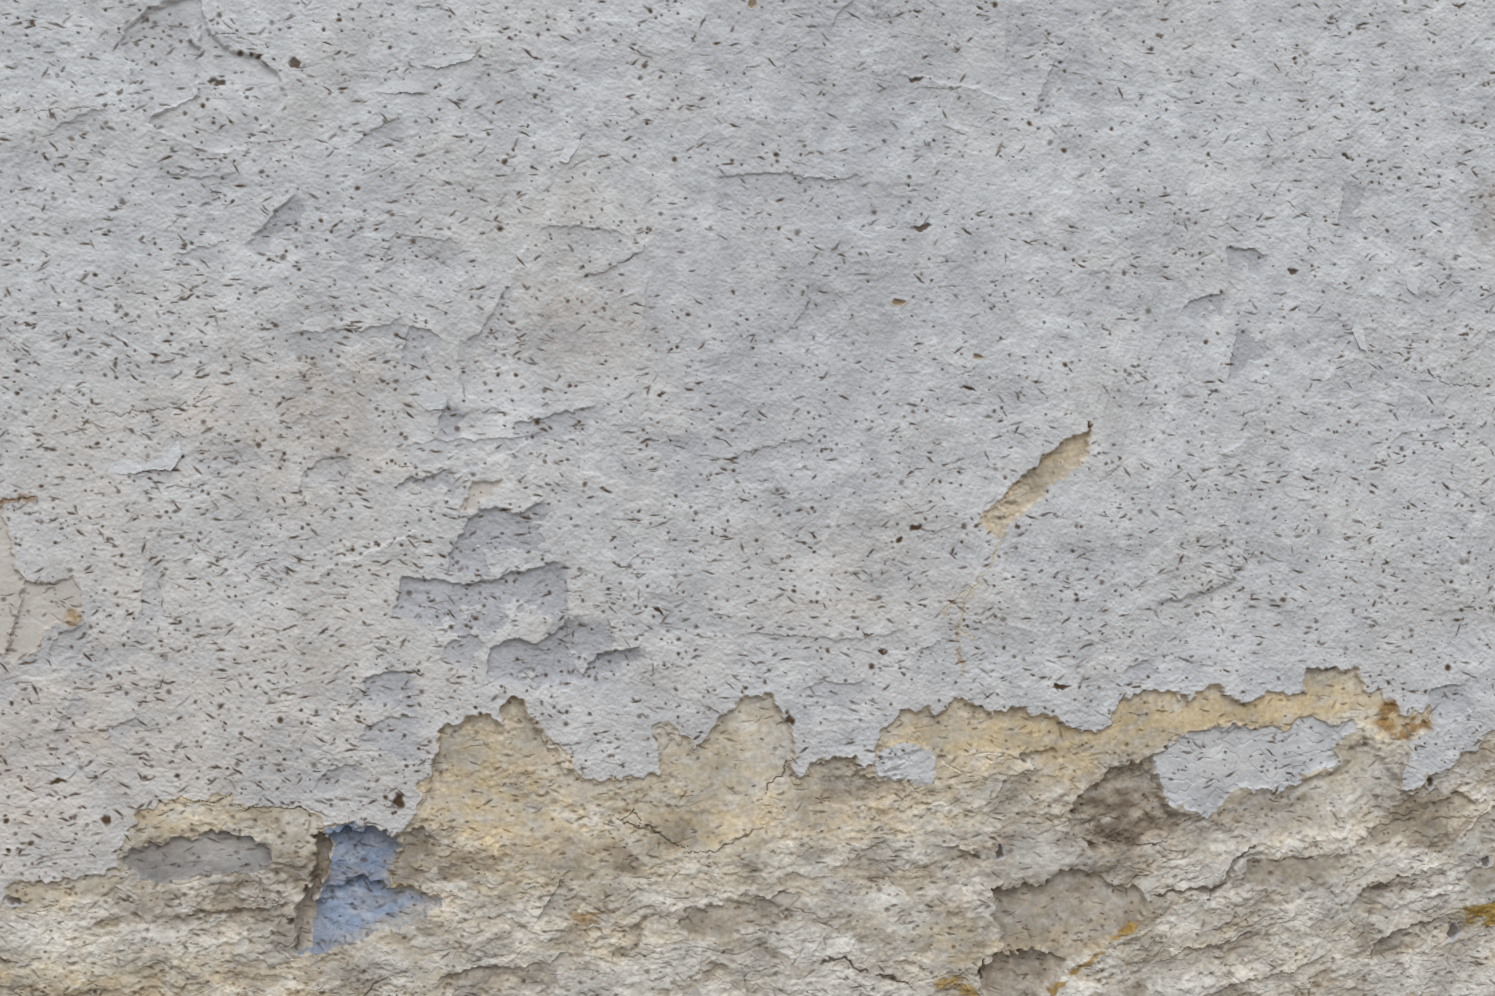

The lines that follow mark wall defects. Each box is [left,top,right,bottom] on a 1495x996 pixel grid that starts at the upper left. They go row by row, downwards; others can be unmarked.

spalling [0,221,1495,996]